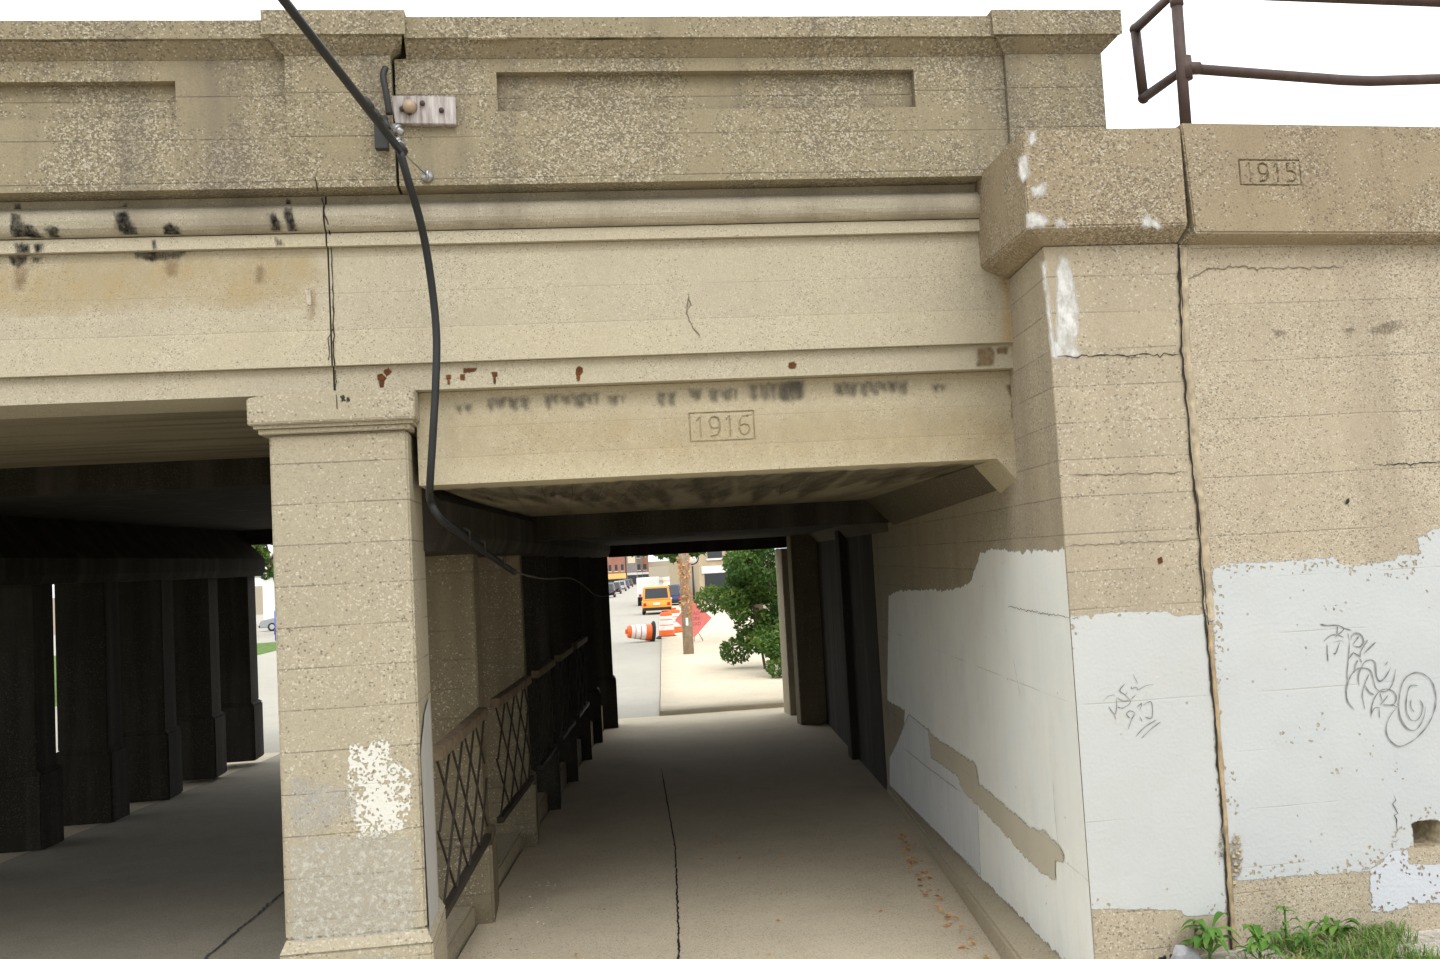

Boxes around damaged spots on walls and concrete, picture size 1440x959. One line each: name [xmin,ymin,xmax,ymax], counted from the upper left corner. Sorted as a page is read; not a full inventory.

damp [10,205,61,266]
damp [116,206,185,274]
damp [271,200,297,243]
corrosion [377,368,392,387]
corrosion [446,368,498,385]
crack [1059,247,1345,950]
peeling [887,528,1440,959]
peeling [290,698,439,942]
crack [204,891,284,959]